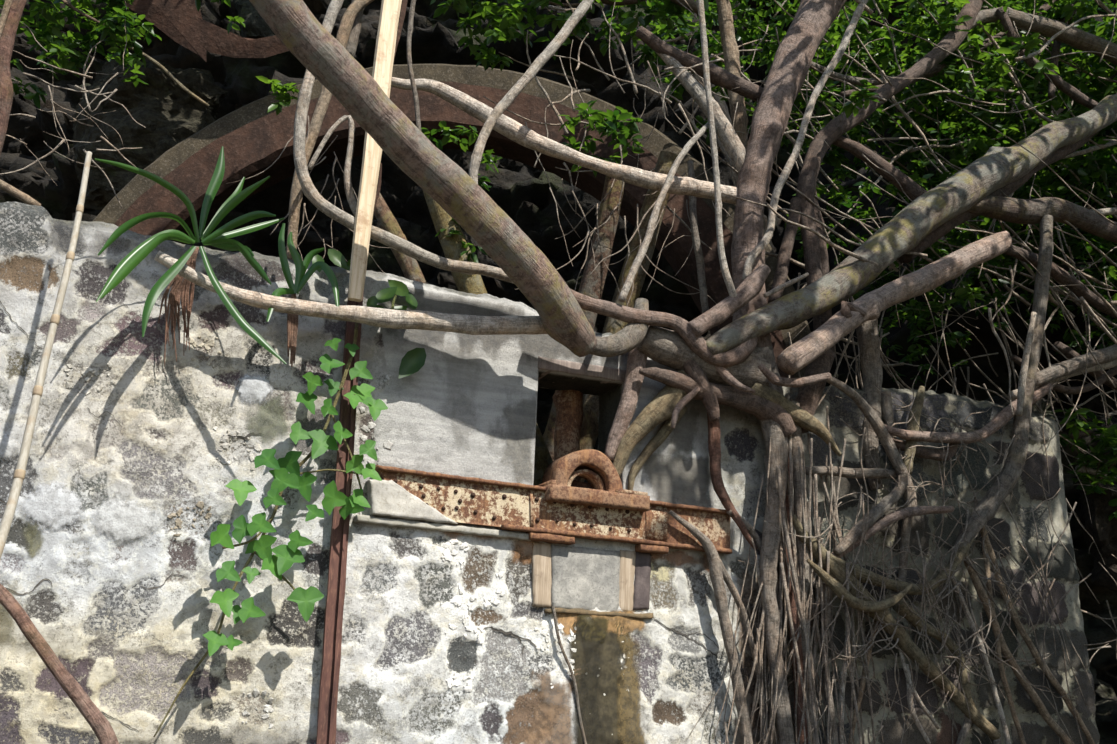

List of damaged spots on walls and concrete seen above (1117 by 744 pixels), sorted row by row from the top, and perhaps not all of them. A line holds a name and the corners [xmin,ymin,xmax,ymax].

rust [510,538,539,563]
rust [524,669,579,744]
leakage [570,621,646,744]